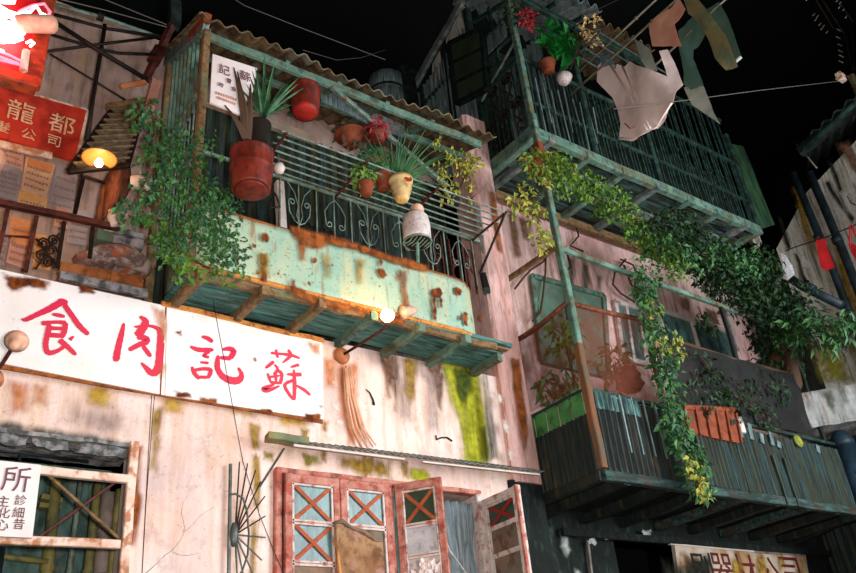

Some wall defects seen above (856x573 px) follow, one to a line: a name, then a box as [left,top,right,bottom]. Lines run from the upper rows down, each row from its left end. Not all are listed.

corrosion [156,310,166,337]
corrosion [195,209,482,335]
damp [381,355,497,466]